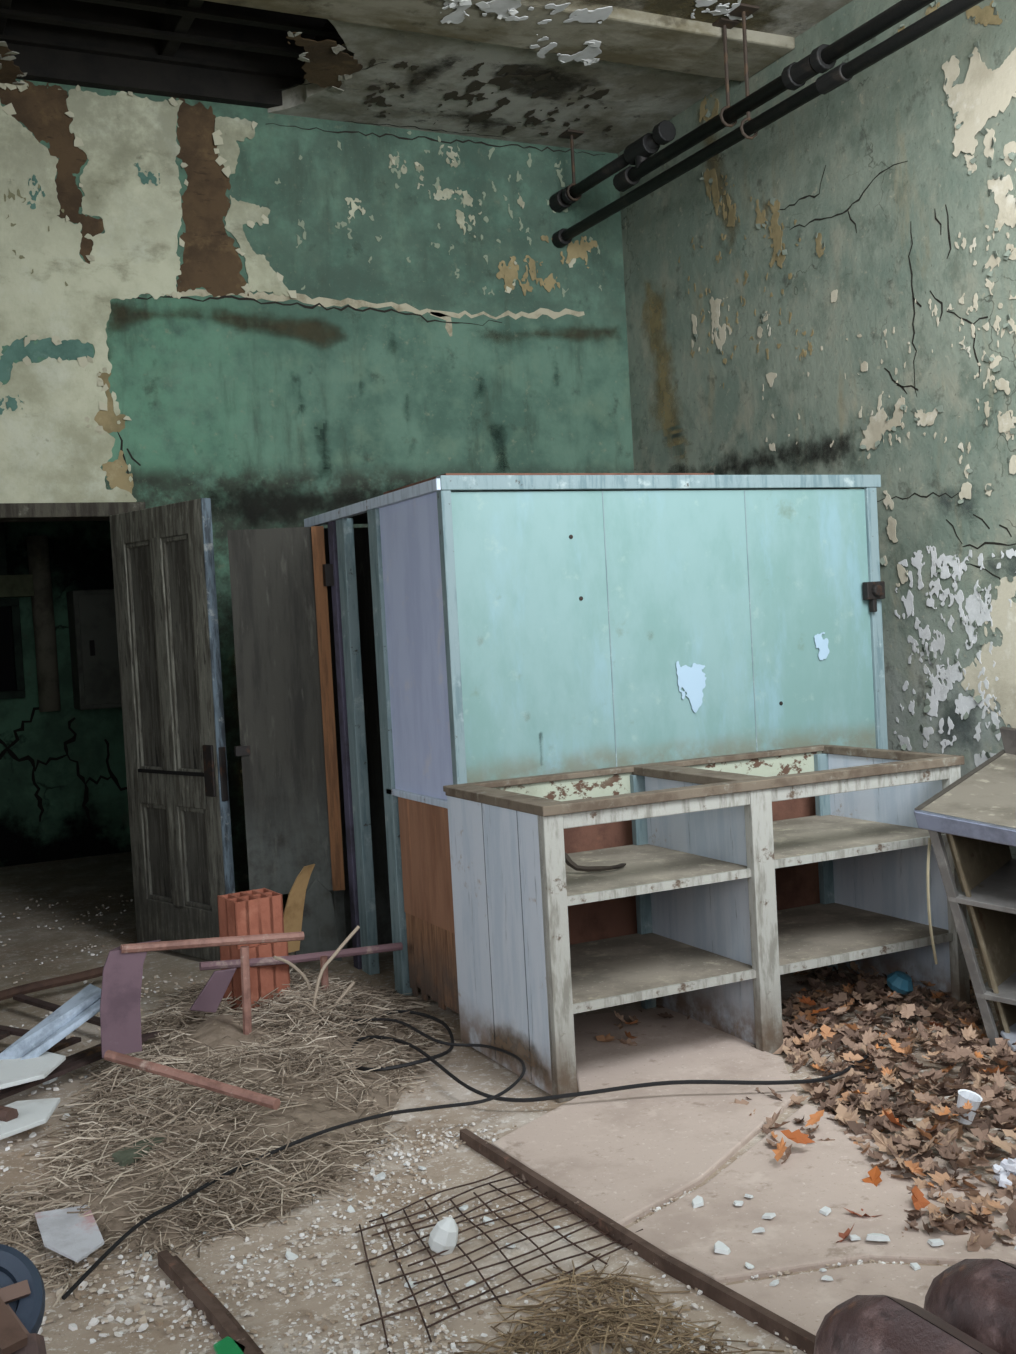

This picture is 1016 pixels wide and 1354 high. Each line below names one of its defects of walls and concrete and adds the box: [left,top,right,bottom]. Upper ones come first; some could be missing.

peeling [0,0,382,503]
leakage [184,312,341,345]
peeling [363,0,613,297]
leakage [501,65,588,100]
leakage [527,0,782,32]
crack [780,161,908,233]
peeling [857,327,995,504]
crack [884,205,988,396]
peeling [915,41,1016,474]
leakage [210,488,390,524]
peeling [880,490,1016,767]
crack [0,707,127,822]